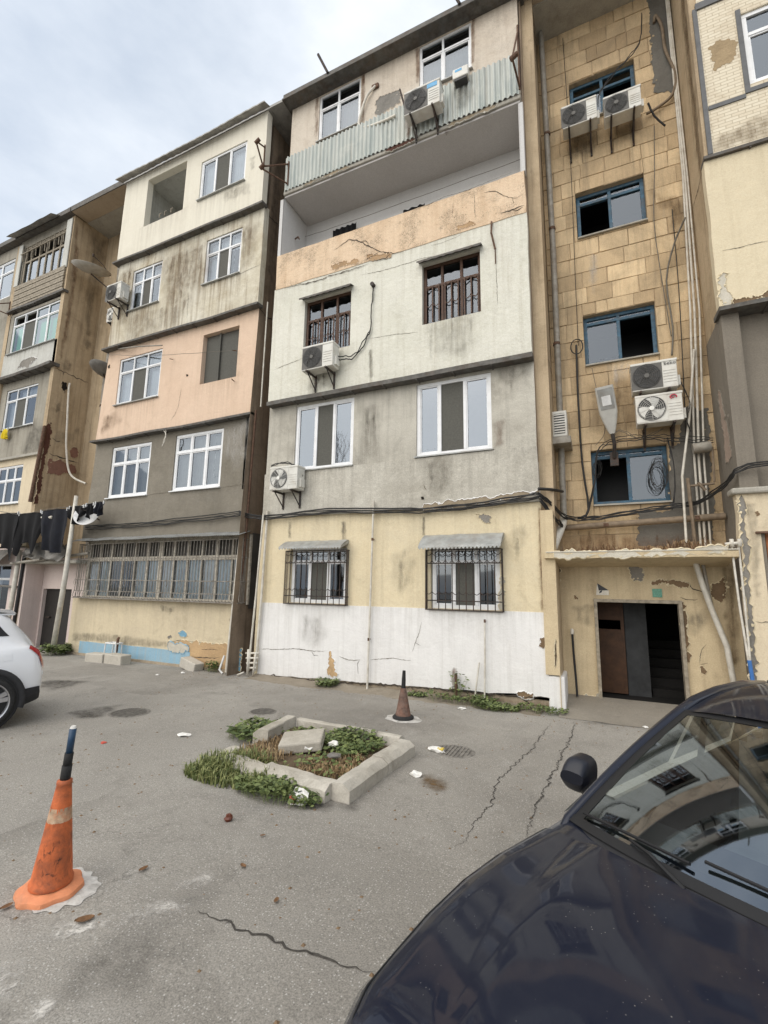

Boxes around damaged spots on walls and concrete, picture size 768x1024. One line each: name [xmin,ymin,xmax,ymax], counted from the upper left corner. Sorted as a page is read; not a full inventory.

peeling [708,39,738,71]
crack [286,174,524,288]
spalling [331,251,392,271]
peeling [716,272,768,306]
spalling [33,423,79,504]
peeling [422,490,540,524]
peeling [553,494,760,680]
spalling [167,630,243,672]
peeling [326,650,339,678]
crack [455,723,576,846]
crack [200,912,372,972]